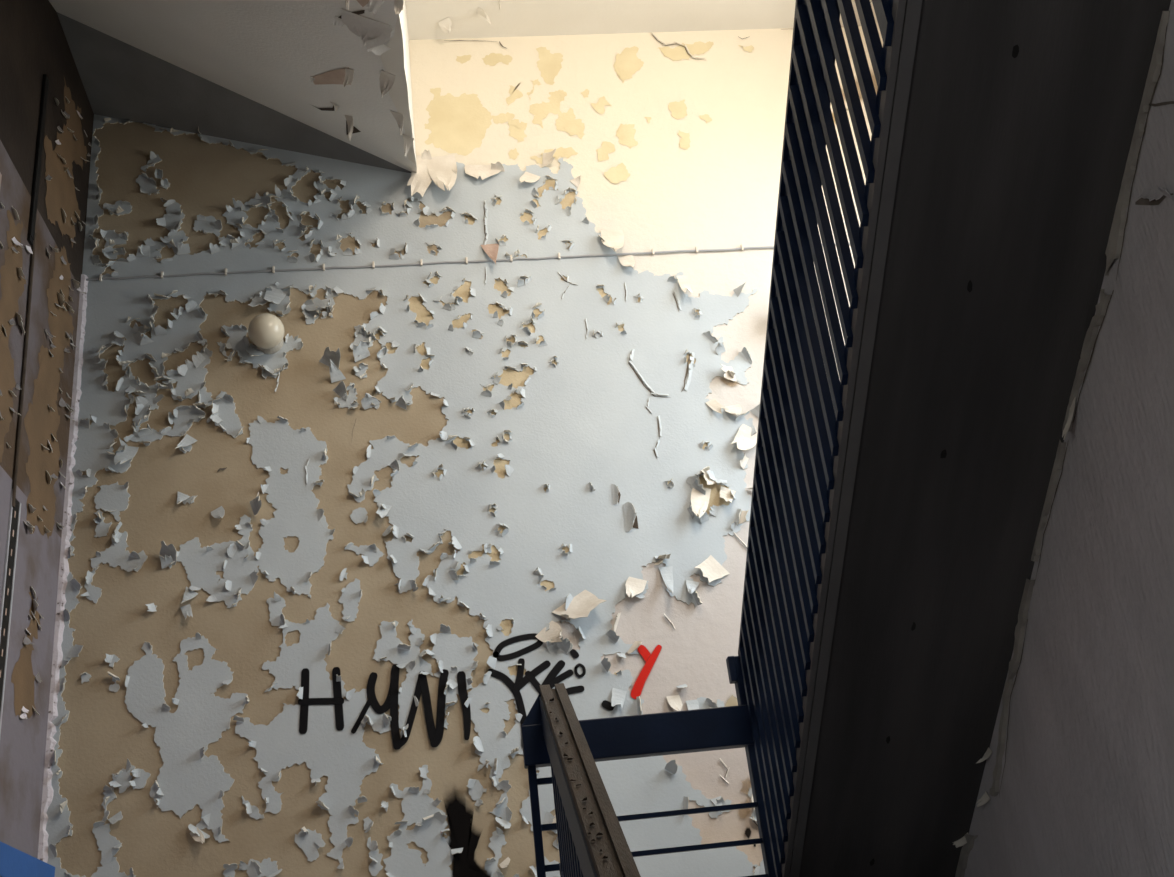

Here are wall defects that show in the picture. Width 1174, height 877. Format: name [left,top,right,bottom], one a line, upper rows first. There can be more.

peeling [0,0,793,877]
peeling [814,26,878,379]